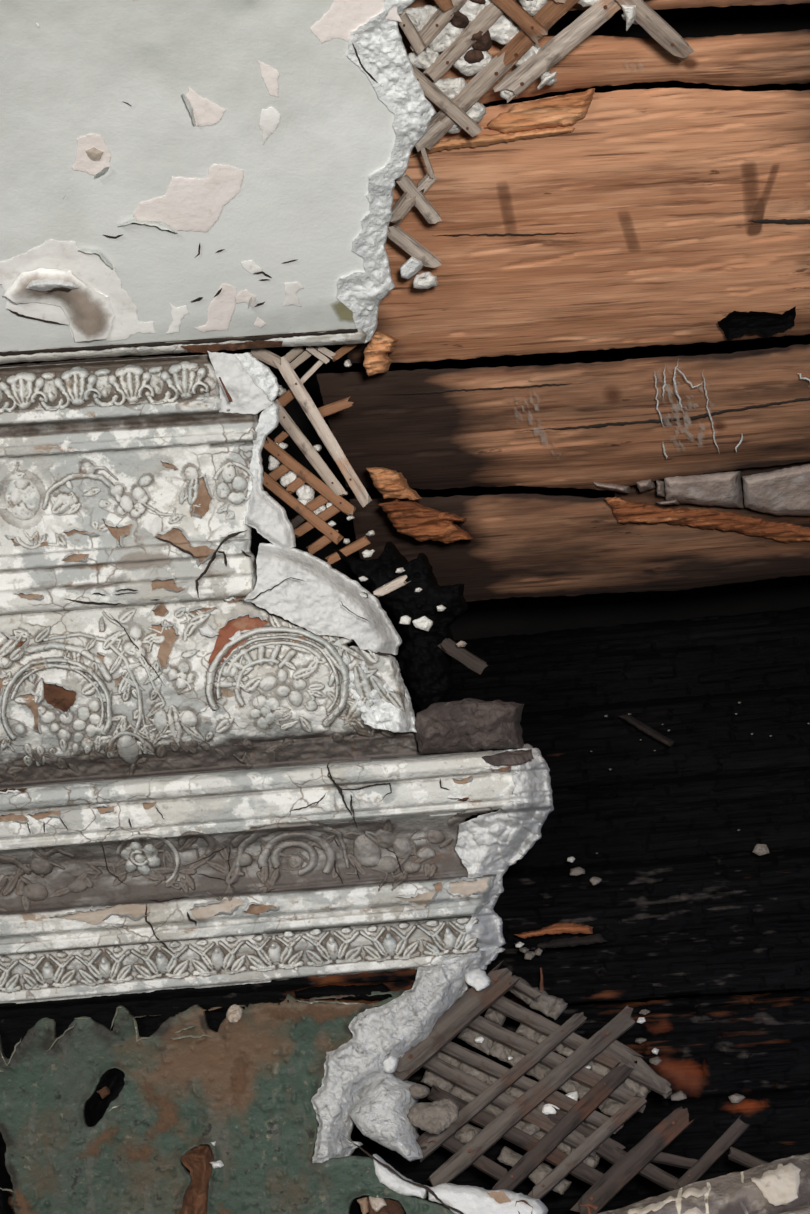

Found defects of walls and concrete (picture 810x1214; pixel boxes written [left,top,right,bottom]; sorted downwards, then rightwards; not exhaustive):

flaking render [621,5,636,31]
flaking render [537,71,557,90]
peeling [104,164,243,239]
flaking render [310,0,437,343]
flaking render [0,239,416,734]
crack [156,530,251,600]
crack [68,588,166,687]
crack [245,577,320,636]
crack [341,602,392,655]
flaking render [311,744,554,1214]
hole [84,1068,125,1127]
hole [180,1141,224,1214]